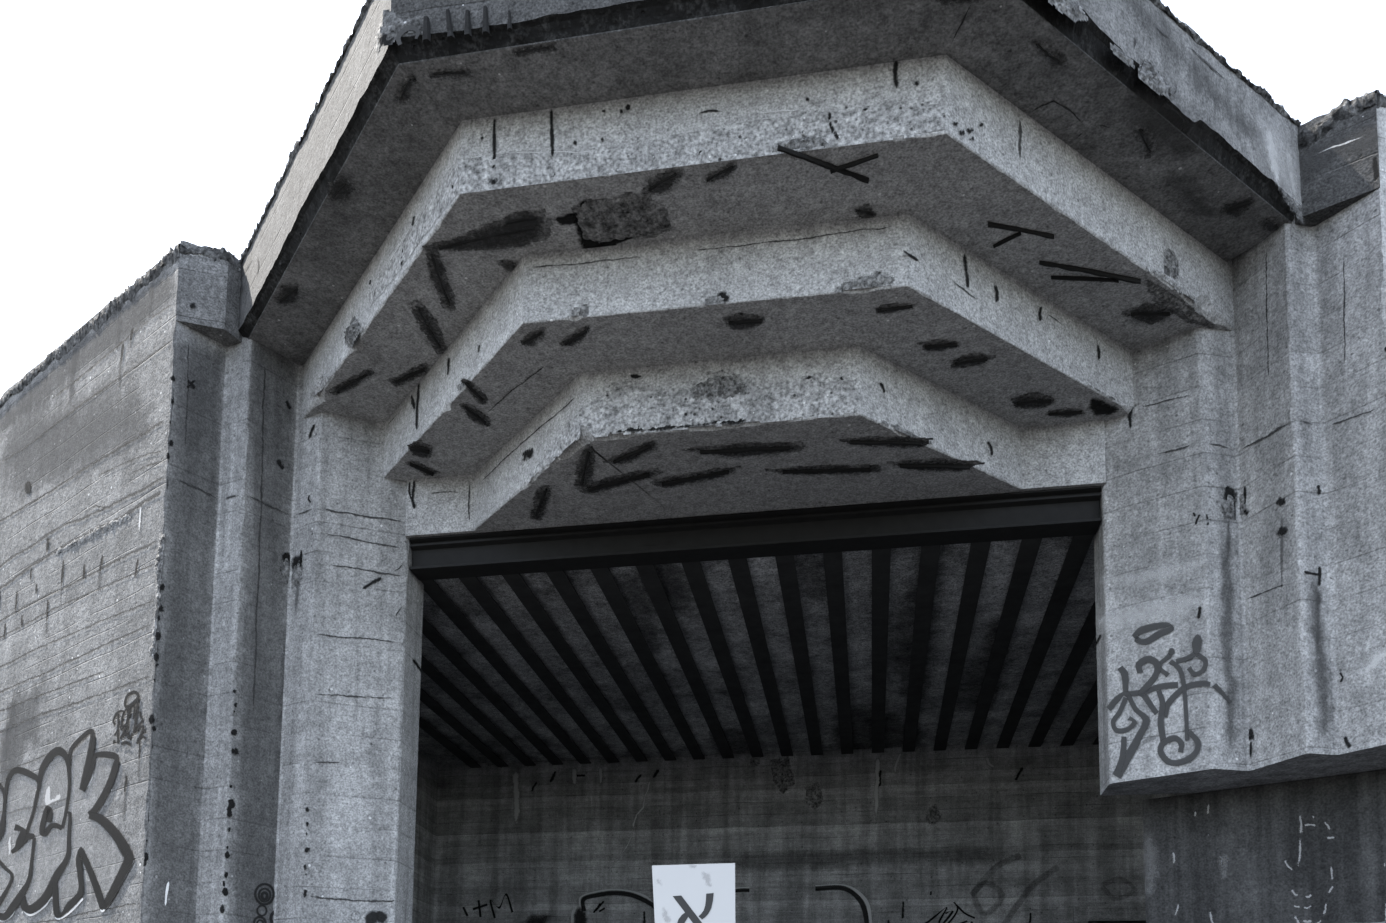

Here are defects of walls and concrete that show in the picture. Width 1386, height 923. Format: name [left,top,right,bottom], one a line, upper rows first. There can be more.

spalling [368,81,983,305]
spalling [571,304,589,317]
spalling [344,316,363,348]